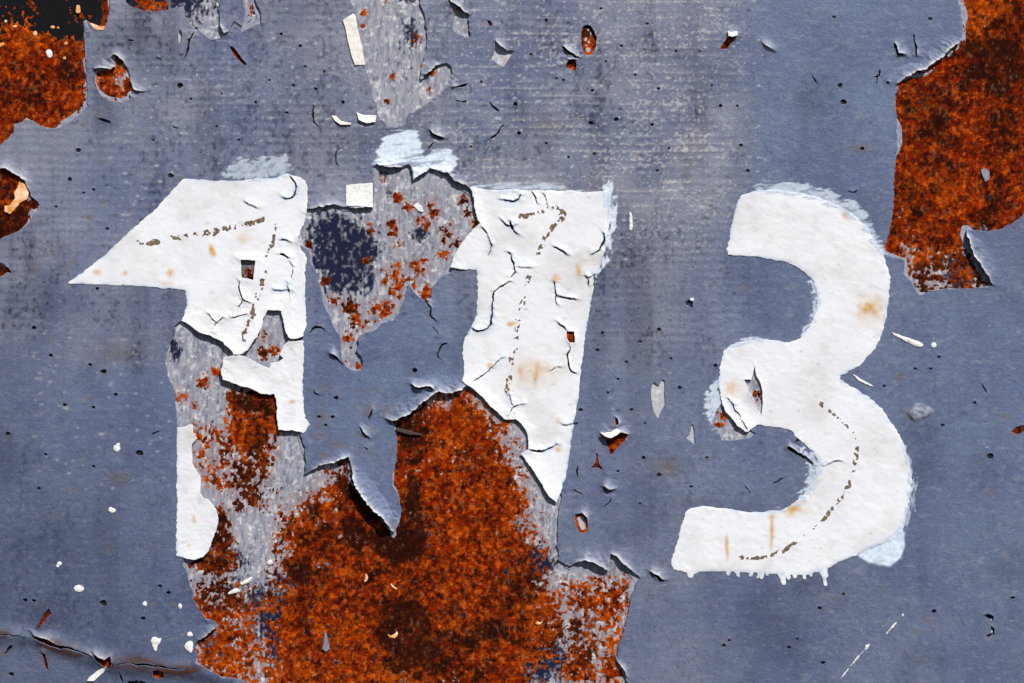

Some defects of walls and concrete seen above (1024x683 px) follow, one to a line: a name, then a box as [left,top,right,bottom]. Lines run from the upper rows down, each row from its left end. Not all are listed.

peeling [332,0,452,128]
peeling [0,168,39,239]
peeling [298,164,484,371]
crack [472,192,546,332]
crack [551,233,605,373]
peeling [885,0,1024,295]
peeling [166,260,640,683]
peeling [714,404,755,441]
peeling [744,367,762,414]
crack [0,634,25,654]
crack [115,662,178,682]